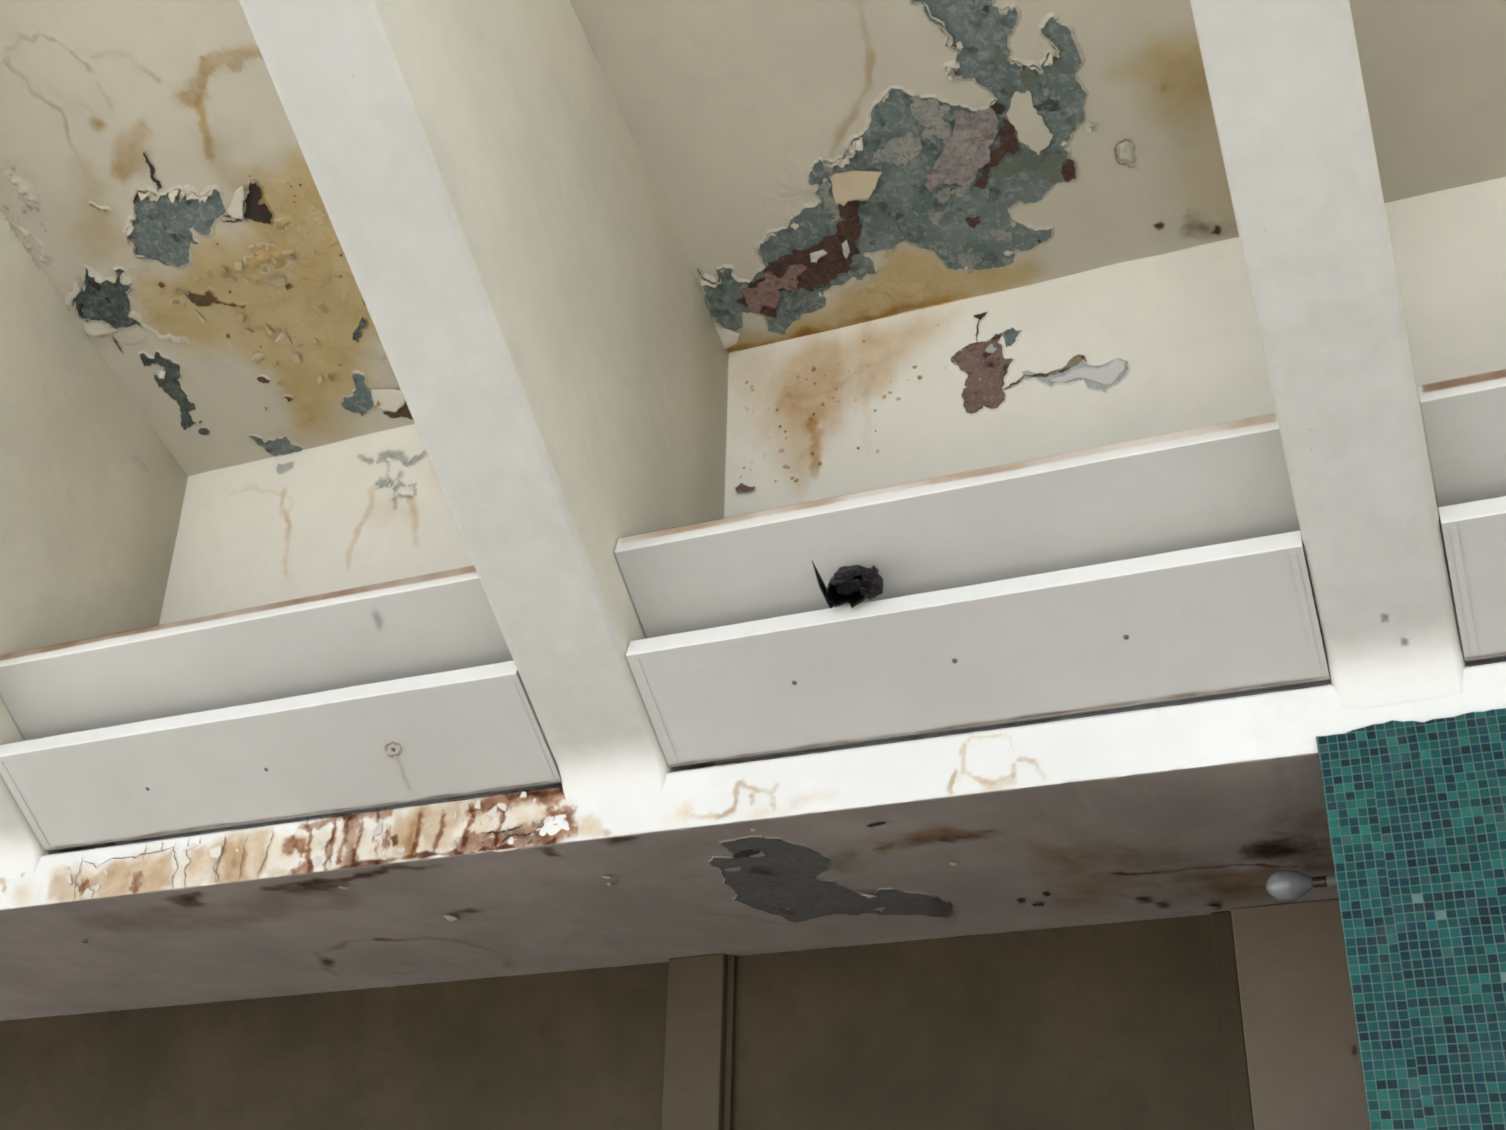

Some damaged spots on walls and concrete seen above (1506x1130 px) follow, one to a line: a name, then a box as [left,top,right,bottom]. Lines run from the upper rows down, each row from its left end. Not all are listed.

peeling [697,0,1092,350]
peeling [65,152,275,436]
damp [173,254,317,388]
peeling [352,299,369,343]
peeling [339,370,413,420]
peeling [950,311,1130,416]
peeling [246,434,305,475]
corrosion [61,846,108,899]
corrosion [111,824,256,858]
corrosion [289,805,418,880]
flaking render [708,835,954,923]